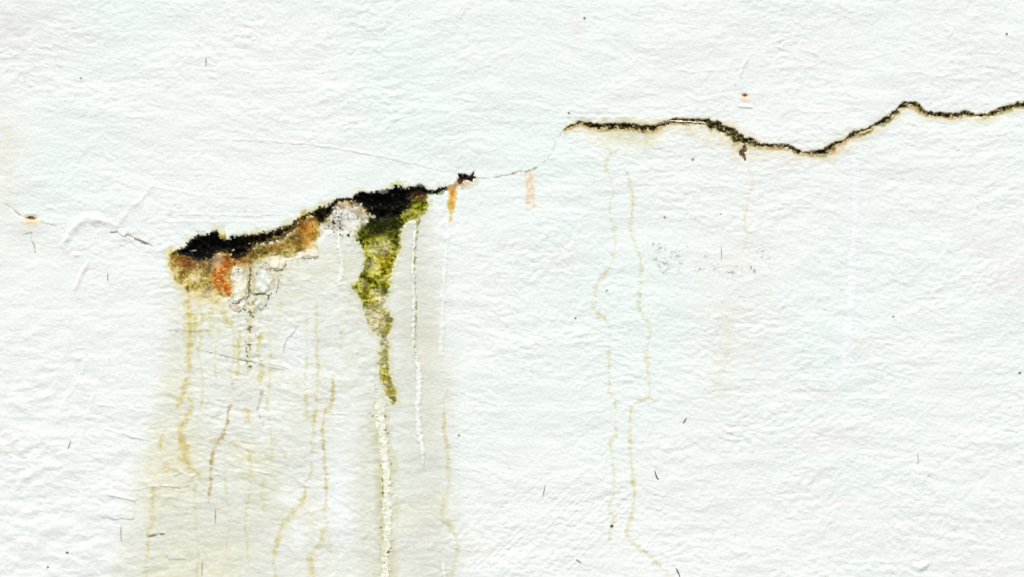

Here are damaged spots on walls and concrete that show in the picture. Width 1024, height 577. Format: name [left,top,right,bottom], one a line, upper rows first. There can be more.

corrosion [251,205,325,261]
spalling [324,197,369,241]
corrosion [446,187,458,223]
crack [110,99,1024,272]
corrosion [162,245,242,311]
spalling [226,246,321,322]
damp [105,195,480,577]
damp [590,144,773,577]